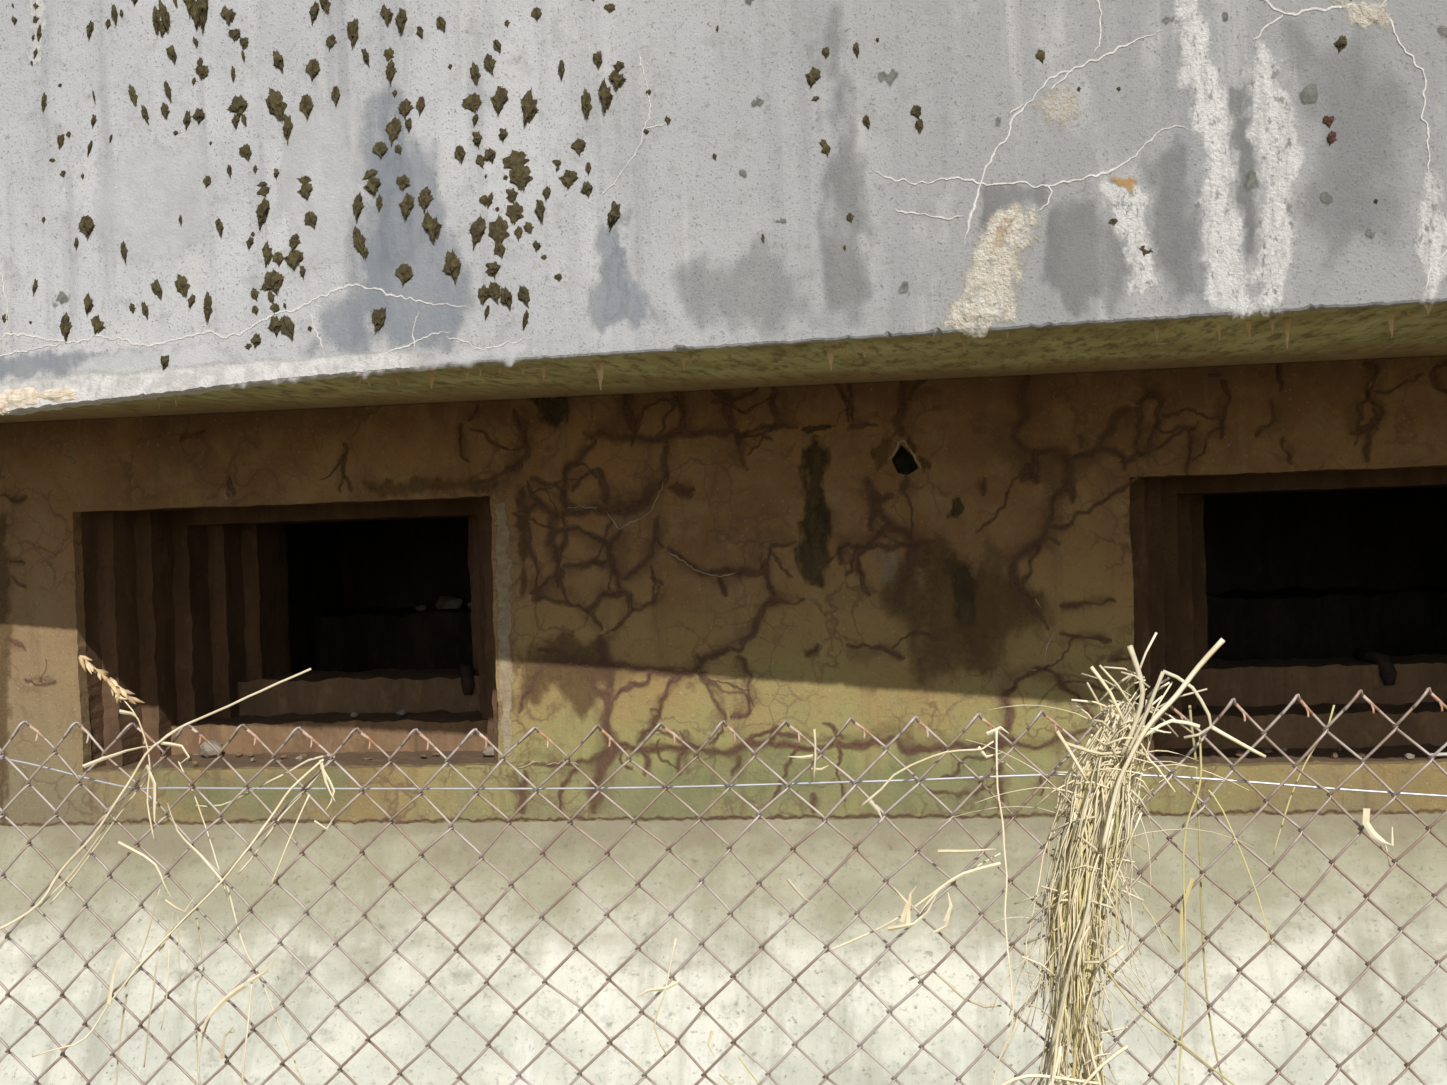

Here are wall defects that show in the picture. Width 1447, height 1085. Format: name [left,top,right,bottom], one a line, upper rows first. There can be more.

leakage [96,141,205,259]
leakage [281,95,538,368]
leakage [591,229,644,329]
leakage [943,185,1044,337]
crack [874,0,1186,248]
leakage [1172,0,1305,315]
crack [1253,0,1430,180]
leakage [1414,172,1447,299]
crack [1425,249,1447,289]
leakage [794,425,832,588]
spalling [889,440,921,475]
crack [0,361,1447,826]